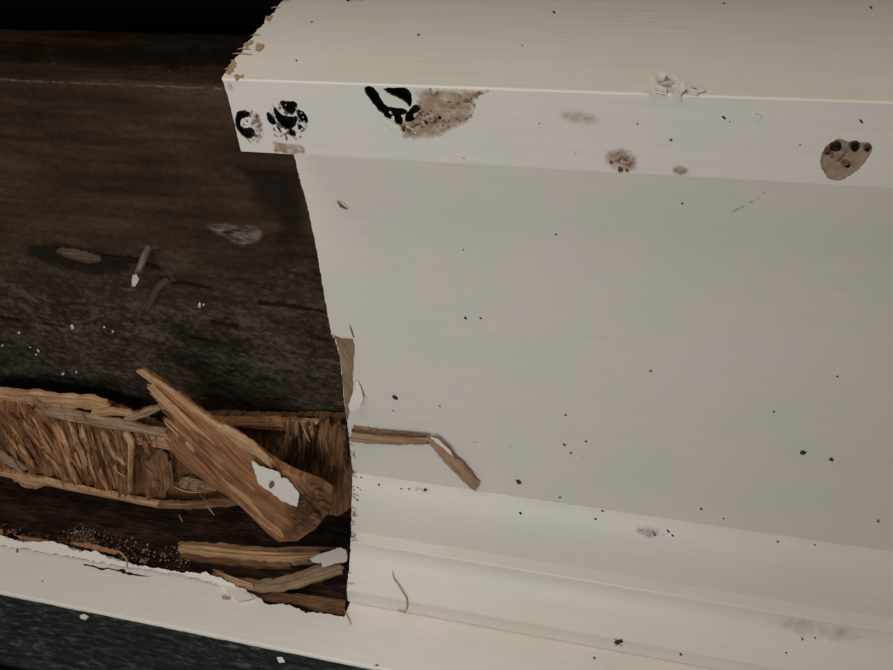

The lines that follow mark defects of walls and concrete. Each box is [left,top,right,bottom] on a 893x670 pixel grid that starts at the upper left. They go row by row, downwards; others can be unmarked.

leakage [272,106,306,141]
spalling [820,139,872,180]
peeling [332,324,363,420]
peeling [252,461,299,507]
peeling [0,529,348,603]